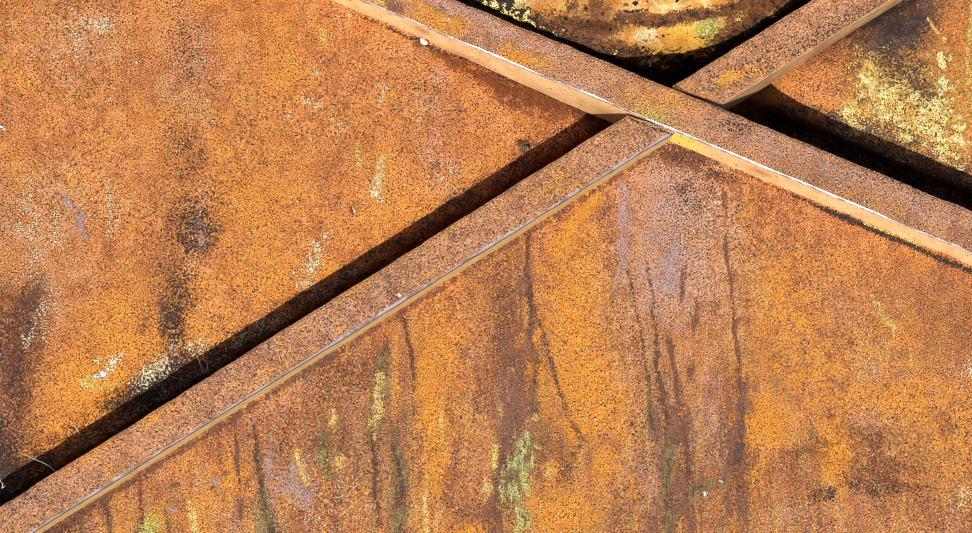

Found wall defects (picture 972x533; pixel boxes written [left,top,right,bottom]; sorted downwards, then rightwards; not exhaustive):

corrosion [377,0,464,30]
corrosion [335,6,605,130]
corrosion [582,0,624,44]
corrosion [963,3,972,113]
corrosion [513,138,542,161]
corrosion [553,188,603,262]
leakage [44,153,760,533]
corrosion [292,408,348,487]
corrosion [186,498,202,533]
corrosion [421,477,439,533]